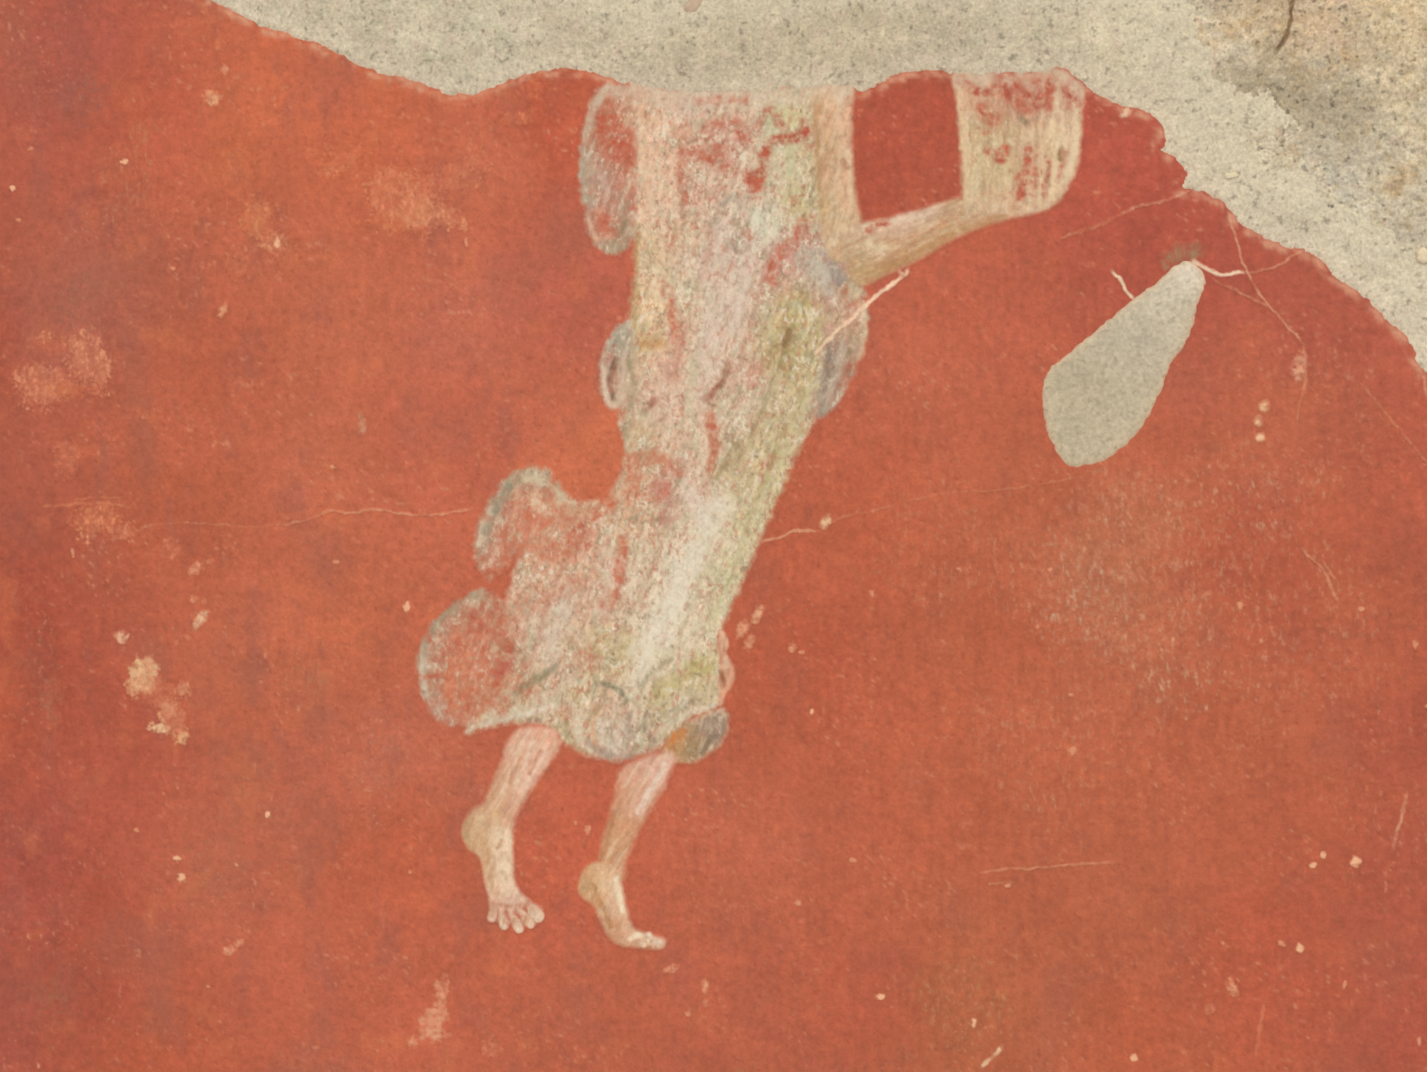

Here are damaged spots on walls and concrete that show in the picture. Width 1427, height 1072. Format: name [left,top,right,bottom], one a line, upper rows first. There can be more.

peeling [199,31,230,109]
peeling [298,126,494,250]
crack [1056,189,1193,242]
crack [1109,268,1135,301]
crack [1190,207,1309,425]
peeling [1289,347,1311,385]
crack [140,506,479,530]
crack [762,472,1100,544]